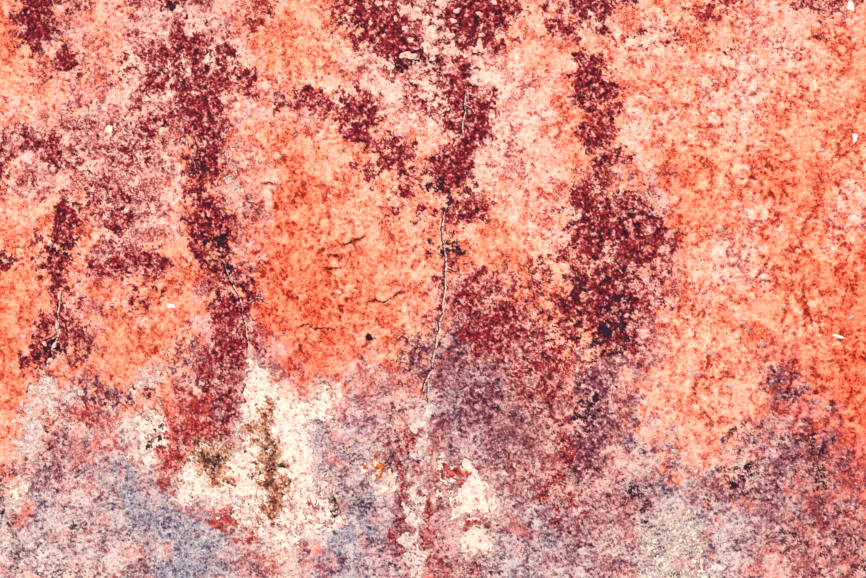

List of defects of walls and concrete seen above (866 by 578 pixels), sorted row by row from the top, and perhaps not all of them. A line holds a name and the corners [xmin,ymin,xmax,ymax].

crack [422,212,458,418]